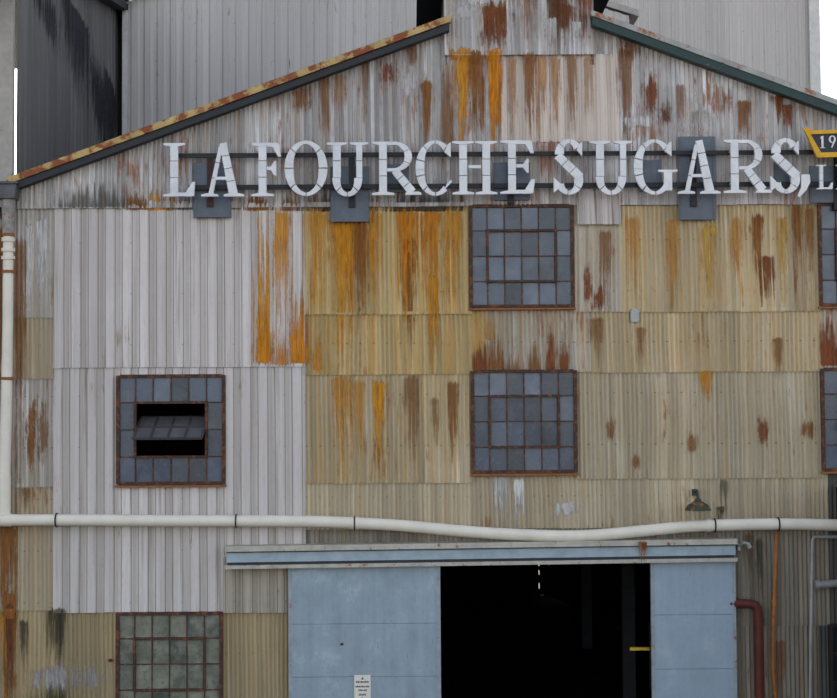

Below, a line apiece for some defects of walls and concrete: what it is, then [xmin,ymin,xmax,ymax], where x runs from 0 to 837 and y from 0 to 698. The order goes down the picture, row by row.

corrosion [421,80,431,144]
corrosion [442,0,593,144]
corrosion [616,38,671,132]
corrosion [721,86,751,136]
corrosion [126,192,177,211]
corrosion [243,193,372,366]
corrosion [396,208,462,357]
corrosion [14,240,48,471]
corrosion [447,382,458,458]
corrosion [0,526,18,698]
damp [20,620,28,651]
damp [46,607,65,661]